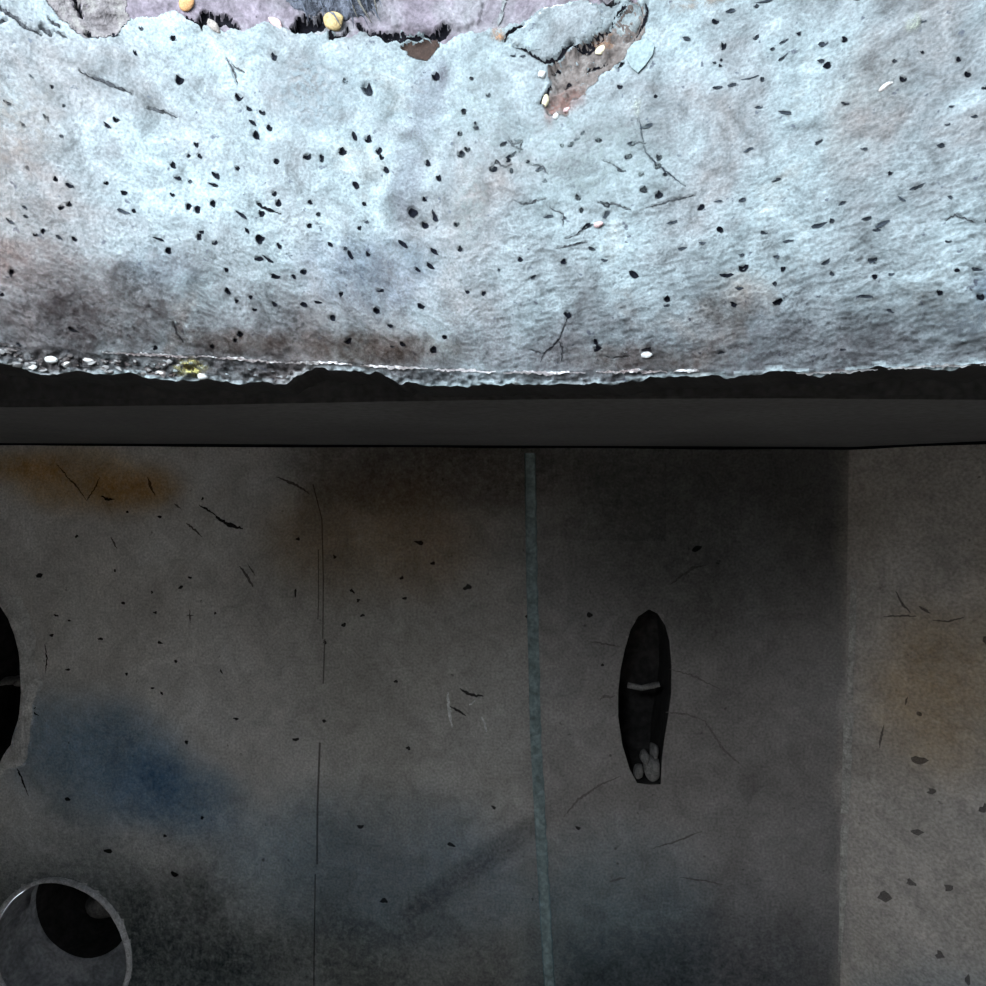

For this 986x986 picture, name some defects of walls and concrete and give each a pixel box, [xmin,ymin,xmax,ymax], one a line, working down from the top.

crack [0,7,68,38]
spalling [47,0,130,38]
spalling [186,11,241,30]
spalling [543,0,655,116]
crack [80,72,176,118]
crack [489,137,548,174]
crack [597,121,694,210]
crack [514,198,586,249]